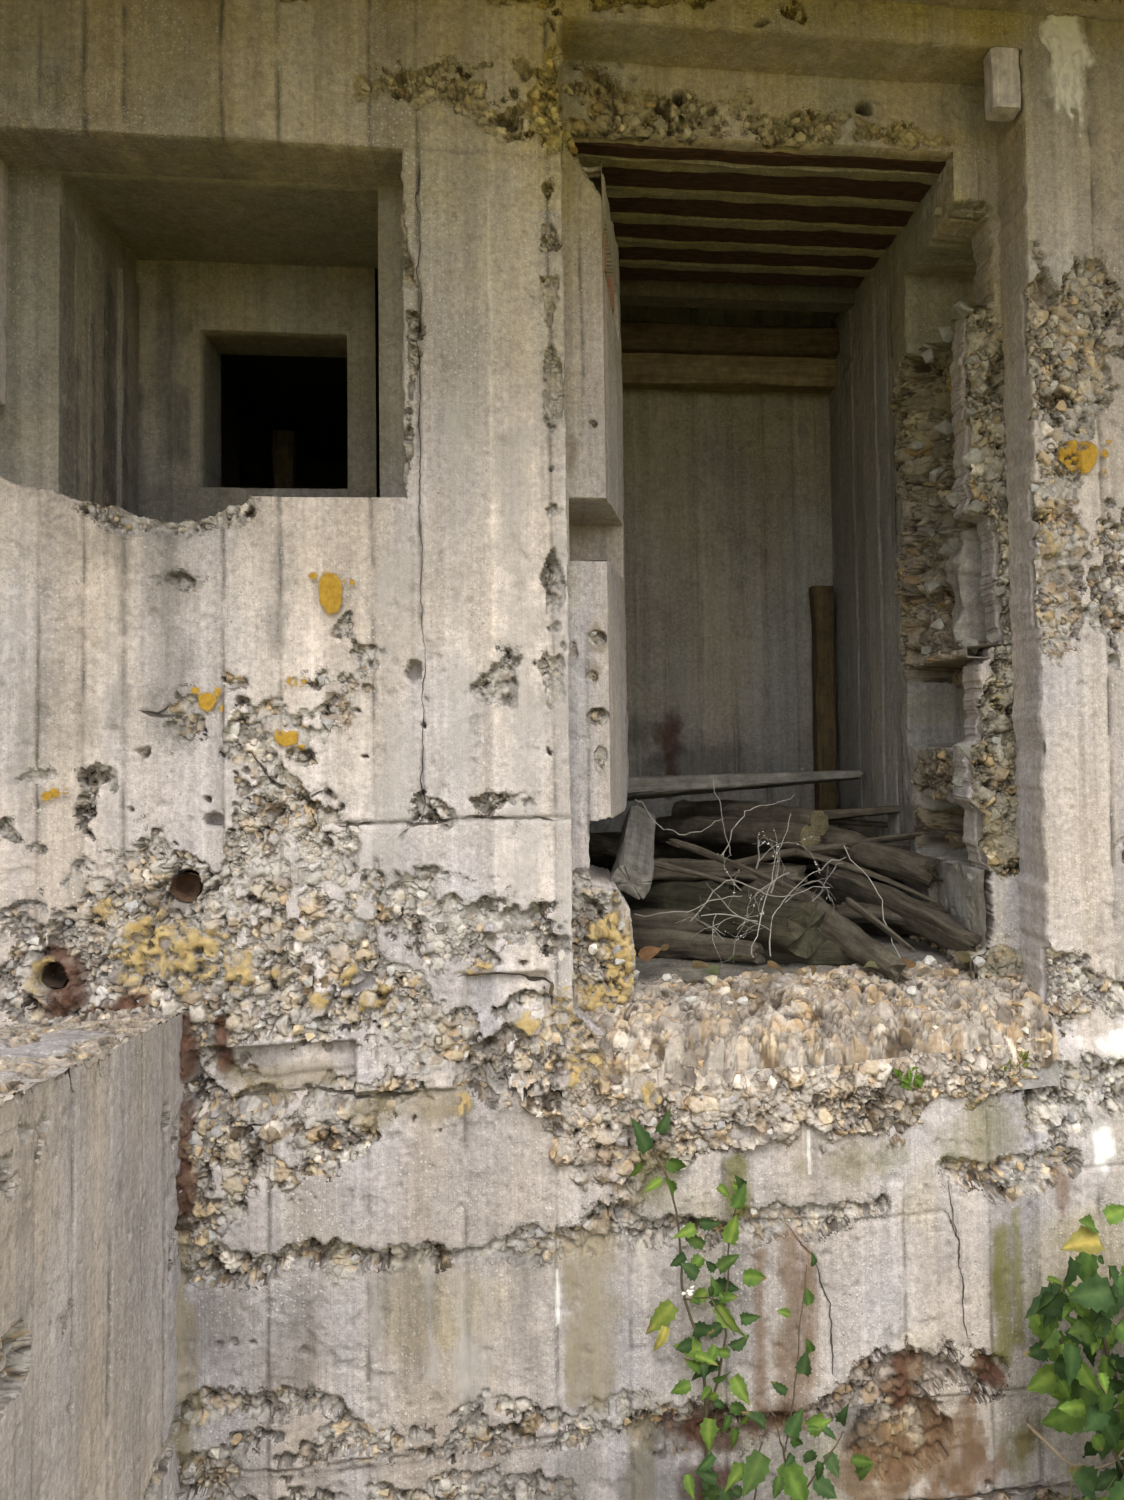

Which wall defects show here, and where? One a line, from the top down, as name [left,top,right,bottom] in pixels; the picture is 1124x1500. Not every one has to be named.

spalling [347,42,959,255]
damp [1039,15,1094,137]
spalling [1024,236,1124,672]
spalling [469,544,608,714]
spalling [889,307,1020,880]
rust [44,946,149,1019]
spalling [0,610,1124,1293]
spalling [143,1333,1013,1500]
crack [787,1225,834,1373]
rust [892,1354,912,1409]
crack [948,1186,968,1337]
rust [975,1354,1005,1387]